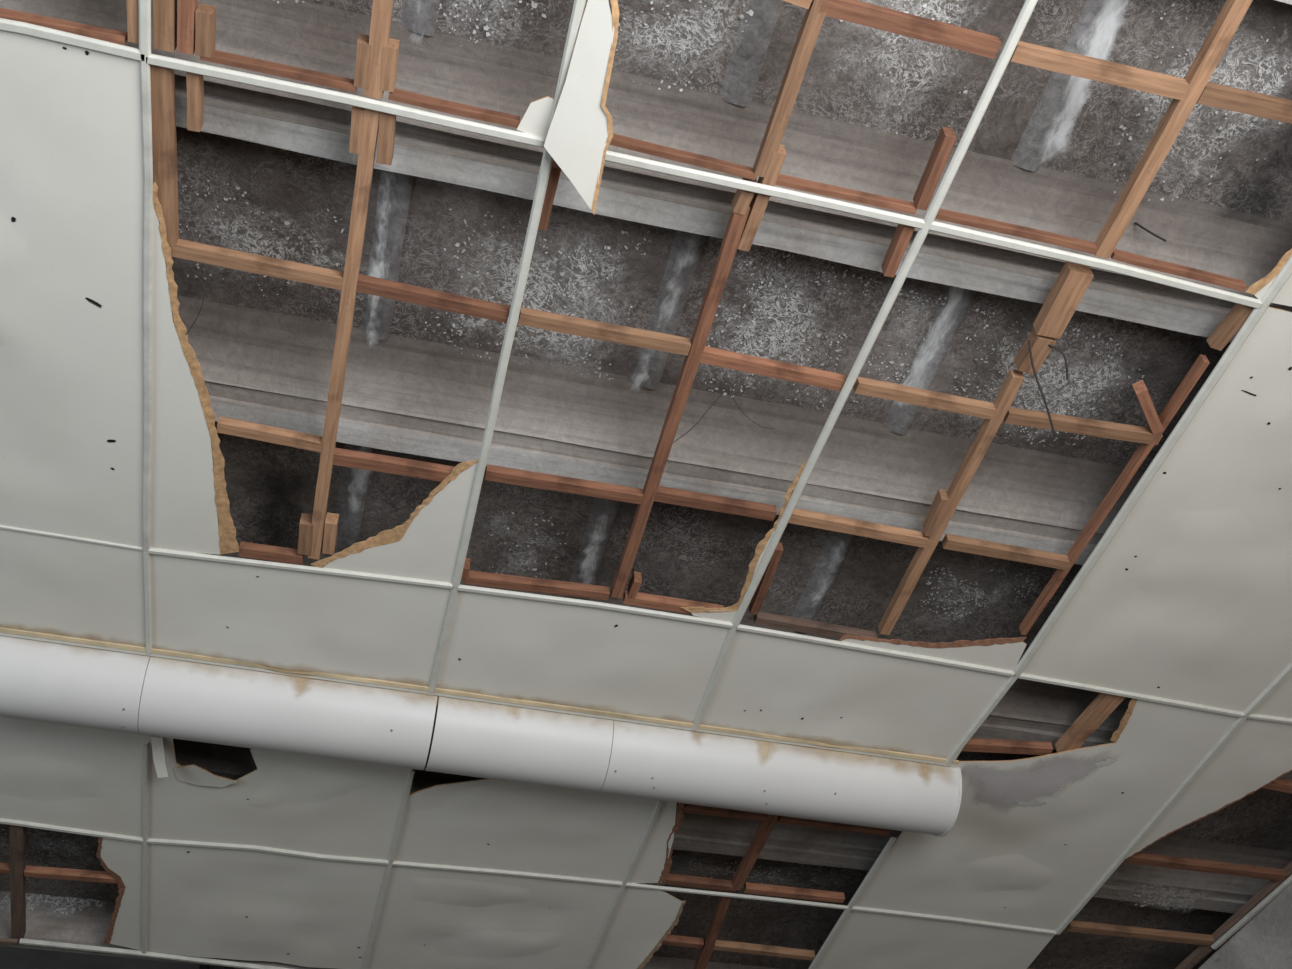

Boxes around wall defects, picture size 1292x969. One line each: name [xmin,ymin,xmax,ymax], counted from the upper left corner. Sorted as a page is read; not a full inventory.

leakage [248,664,357,689]
leakage [755,737,872,760]
peeling [965,758,1115,808]